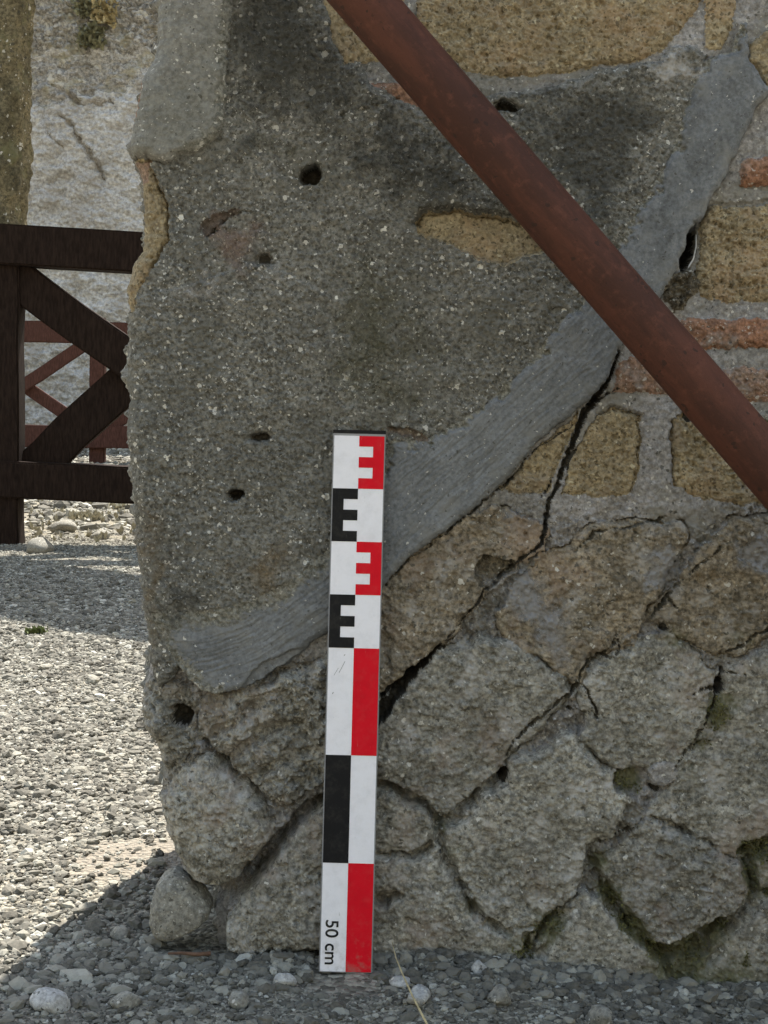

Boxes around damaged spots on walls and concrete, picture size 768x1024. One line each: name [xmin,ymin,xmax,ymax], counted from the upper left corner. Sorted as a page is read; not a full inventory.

spalling [415,208,545,267]
spalling [663,271,702,313]
crack [378,349,620,725]
crack [575,512,677,552]
crack [650,546,722,618]
crack [506,634,621,757]
crack [678,628,768,763]
crack [599,825,638,843]